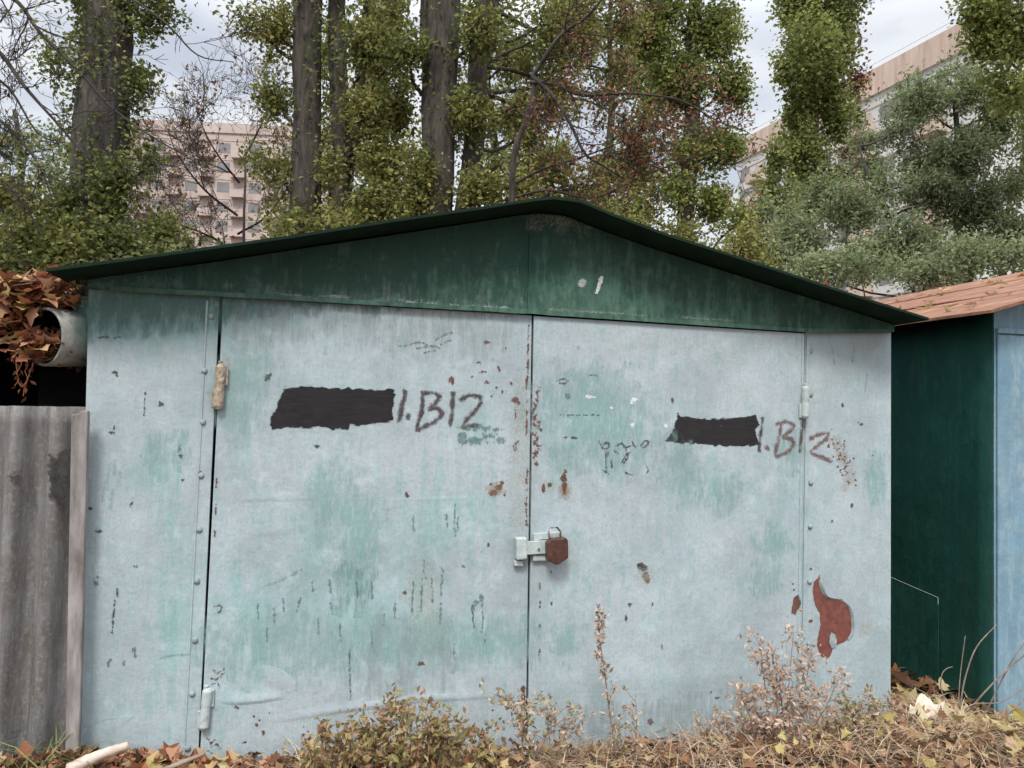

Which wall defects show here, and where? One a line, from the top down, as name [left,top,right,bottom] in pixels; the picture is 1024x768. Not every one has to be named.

rust [525,325,542,484]
leakage [47,448,71,507]
peeling [808,568,855,659]